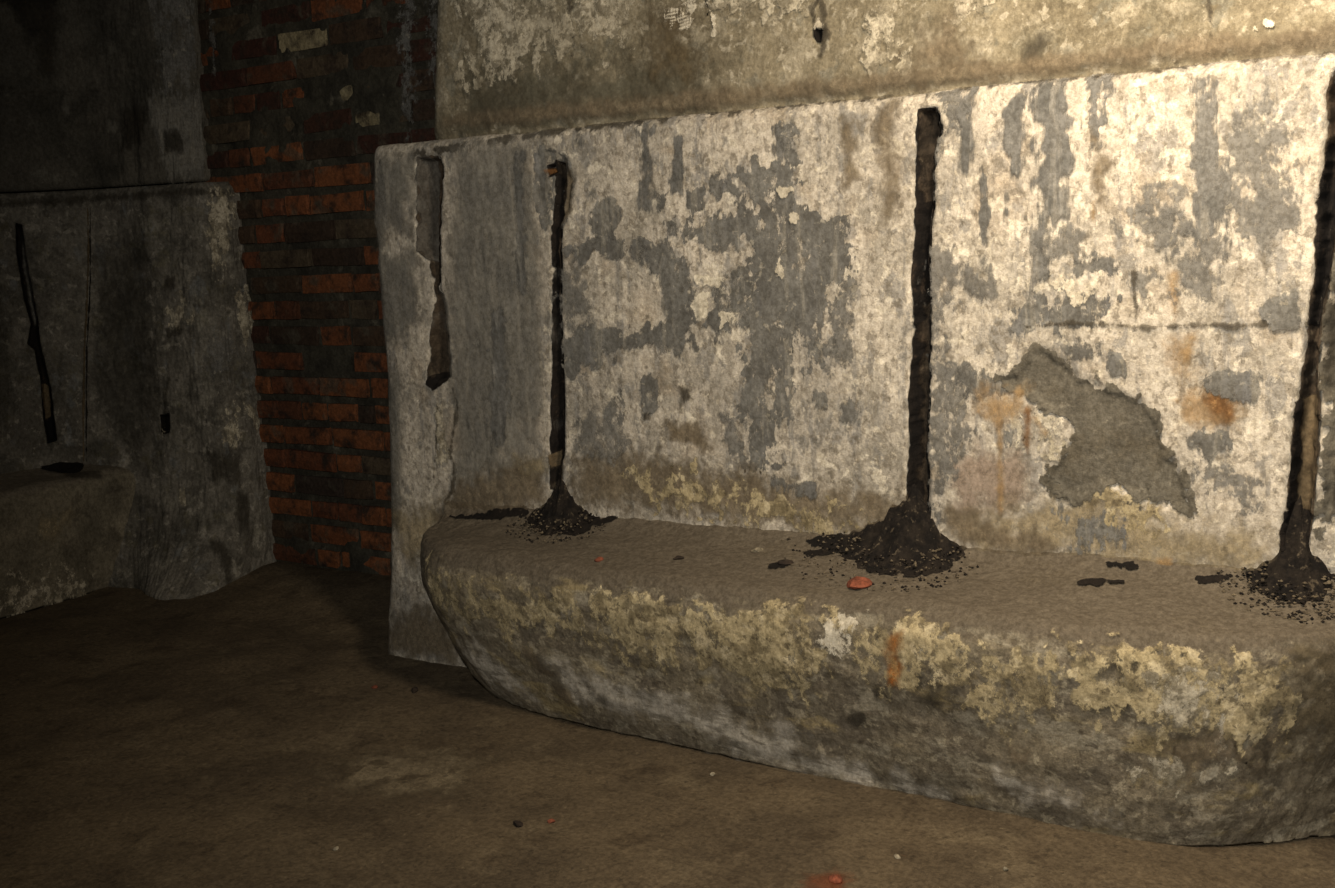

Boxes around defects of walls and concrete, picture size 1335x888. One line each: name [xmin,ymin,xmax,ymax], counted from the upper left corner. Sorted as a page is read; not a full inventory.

crack [705,0,717,37]
crack [810,0,830,57]
water stain [374,0,1335,799]
corrosion [1182,393,1236,424]
water stain [994,767,1071,805]